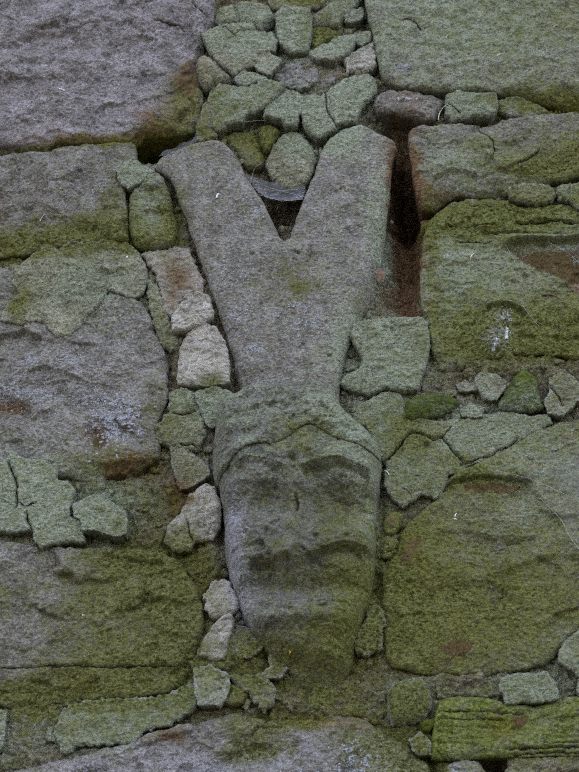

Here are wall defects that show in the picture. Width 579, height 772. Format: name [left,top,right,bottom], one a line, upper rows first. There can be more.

crack [9,464,34,528]